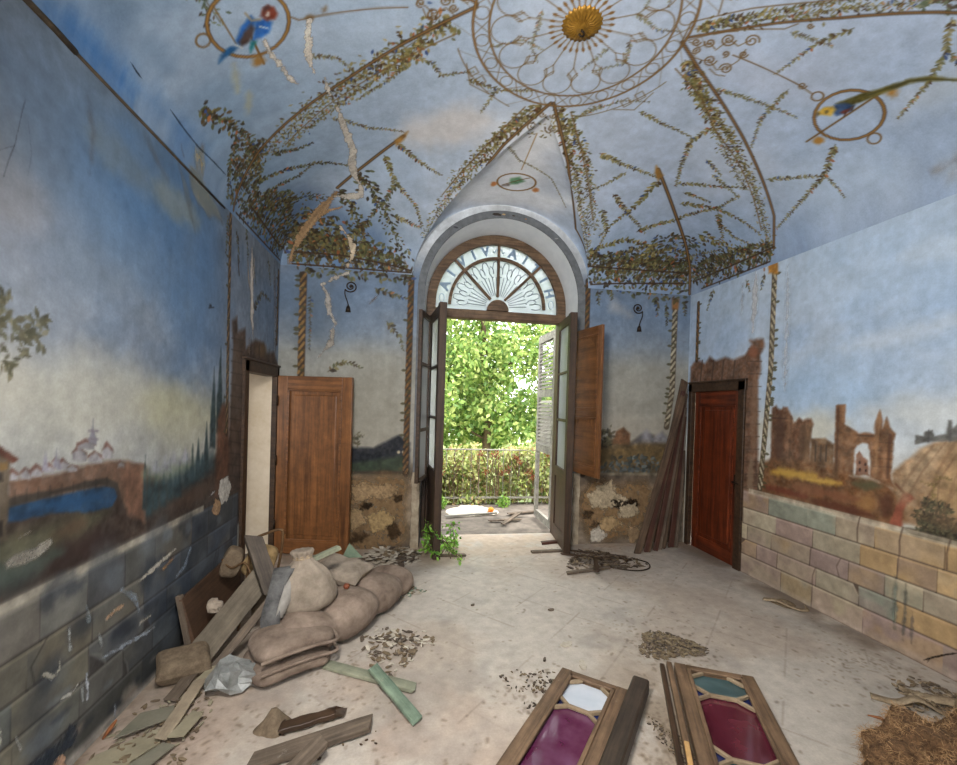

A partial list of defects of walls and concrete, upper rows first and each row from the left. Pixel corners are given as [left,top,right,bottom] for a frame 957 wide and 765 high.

peeling [289,191,343,263]
spalling [211,476,231,515]
spalling [349,474,408,549]
spalling [579,480,652,543]
peeling [7,540,51,567]